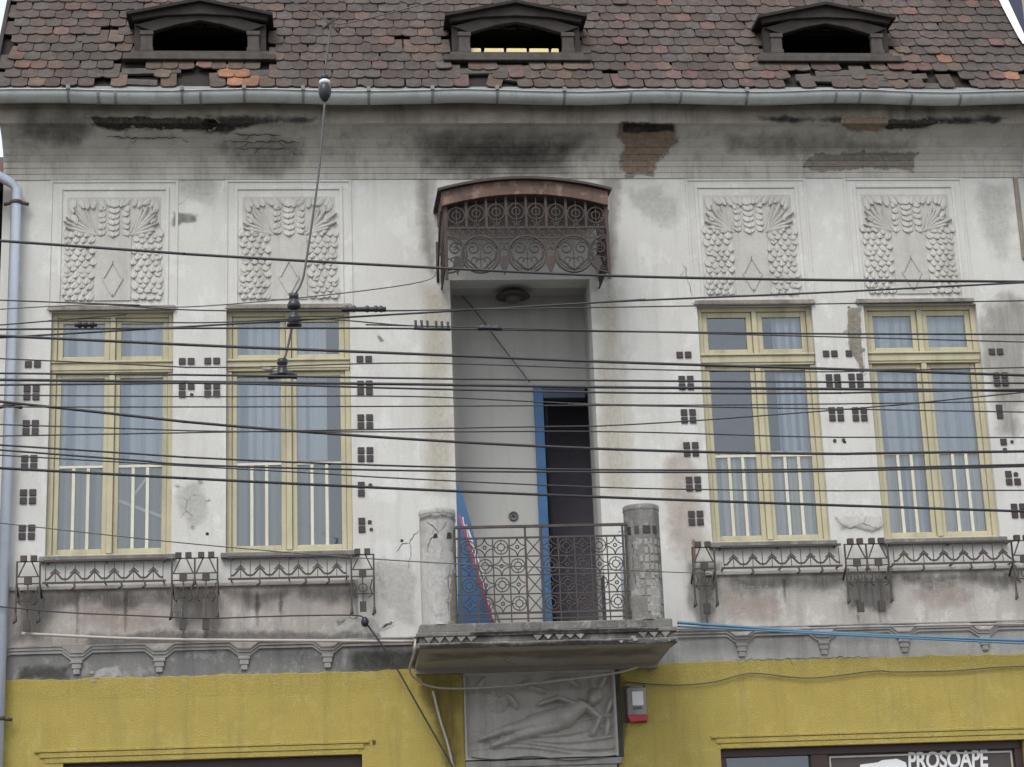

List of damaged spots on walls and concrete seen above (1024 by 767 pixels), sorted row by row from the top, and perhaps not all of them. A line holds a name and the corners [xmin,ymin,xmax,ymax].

flaking render [87,113,221,133]
flaking render [841,115,939,132]
crack [107,135,187,143]
crack [224,133,300,155]
flaking render [617,119,679,178]
flaking render [803,149,919,171]
flaking render [843,306,867,374]